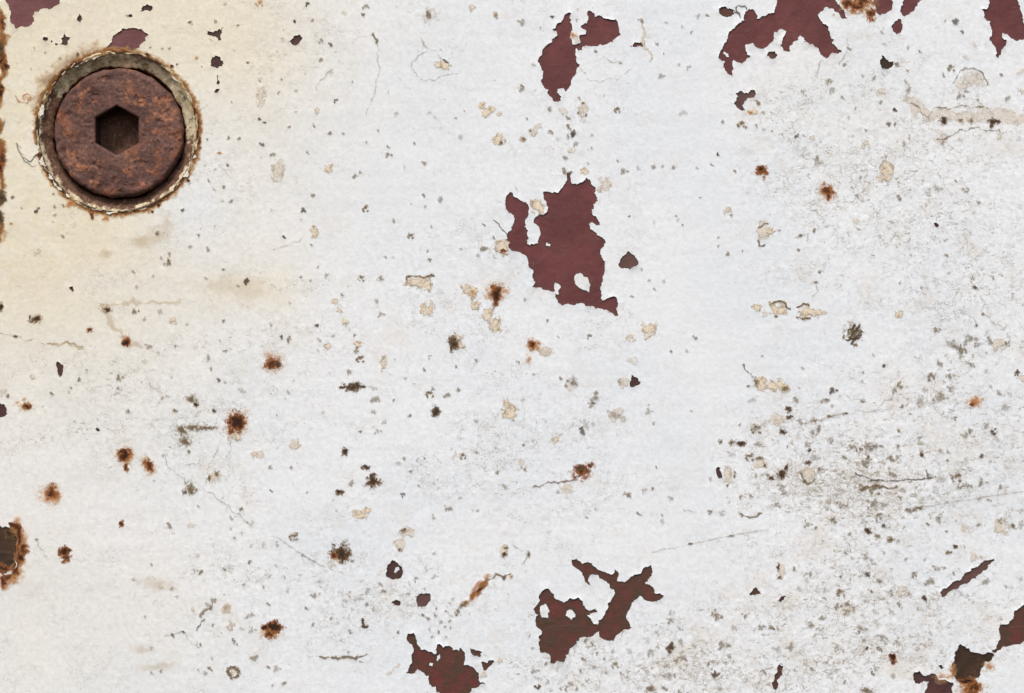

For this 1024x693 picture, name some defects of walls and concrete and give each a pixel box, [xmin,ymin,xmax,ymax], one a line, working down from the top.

peeling [538,11,620,102]
peeling [718,0,847,76]
corrosion [33,47,203,220]
peeling [505,173,618,316]
corrosion [486,282,508,308]
corrosion [225,408,247,434]
corrosion [117,448,154,472]
corrosion [0,518,30,589]
corrosion [261,619,284,640]
peeling [406,633,494,693]
peeling [534,559,664,664]
peeling [913,605,1024,693]